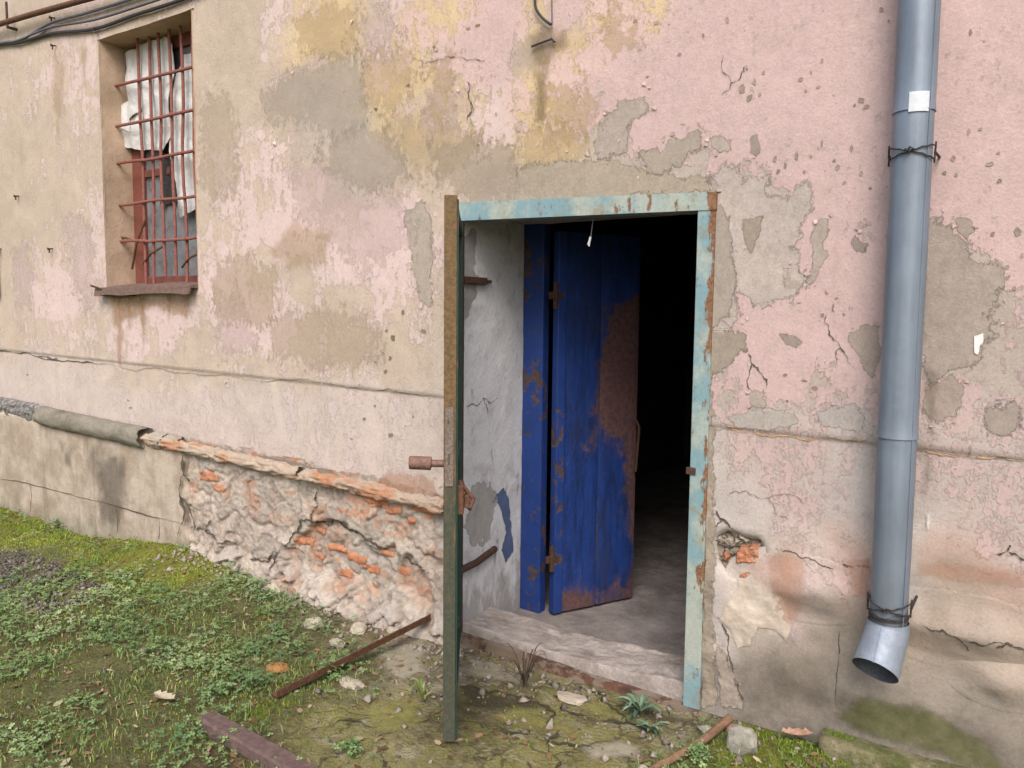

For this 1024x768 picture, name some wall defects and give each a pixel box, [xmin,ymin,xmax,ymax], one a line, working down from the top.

crack [414,56,481,121]
peeling [402,200,436,314]
peeling [921,207,1016,427]
crack [0,350,427,396]
peeling [510,82,846,712]
crack [747,355,768,388]
peeling [984,397,1024,437]
crack [2,455,428,573]
spalling [140,431,443,645]
peeling [463,480,498,547]
crack [715,490,870,569]
crack [926,627,1024,651]